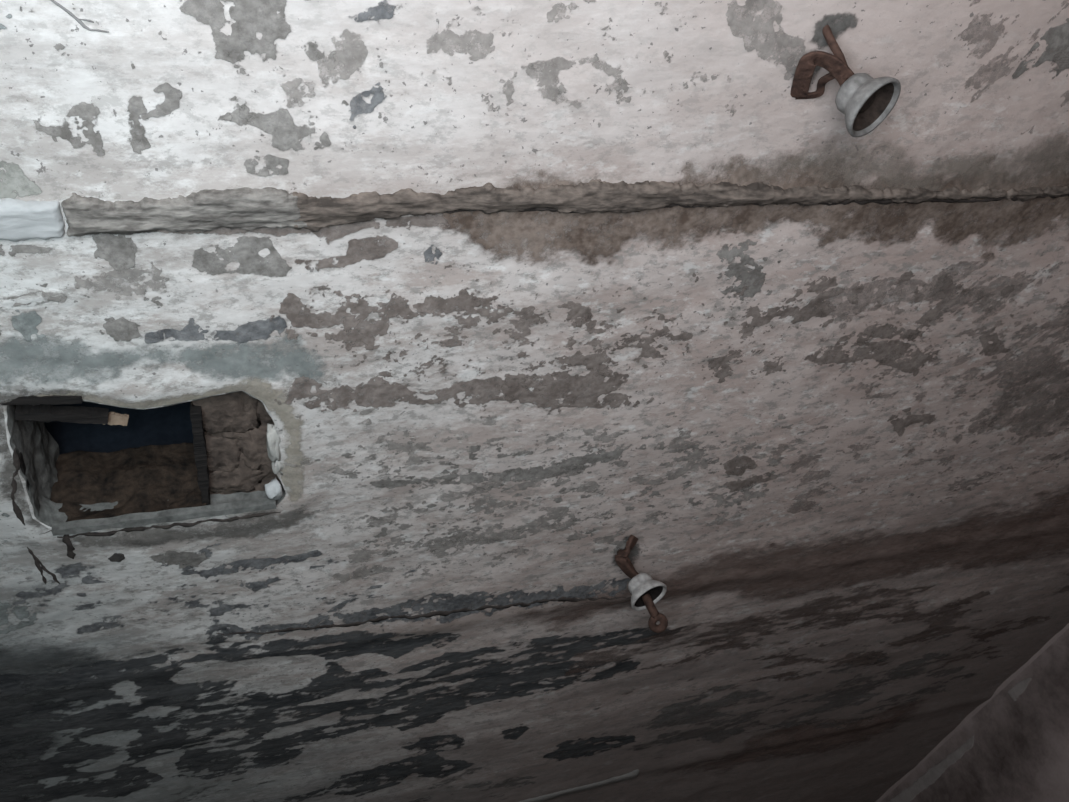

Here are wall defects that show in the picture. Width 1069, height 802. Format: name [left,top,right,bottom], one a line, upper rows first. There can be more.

crack [430,207,575,215]
spalling [0,0,1069,341]
crack [664,201,758,209]
leakage [441,137,1069,265]
crack [794,194,1069,206]
peeling [100,239,1069,502]
leakage [653,492,1069,601]
crack [216,596,631,635]
peeling [0,411,1050,802]
leakage [525,589,632,623]
leakage [0,647,102,792]